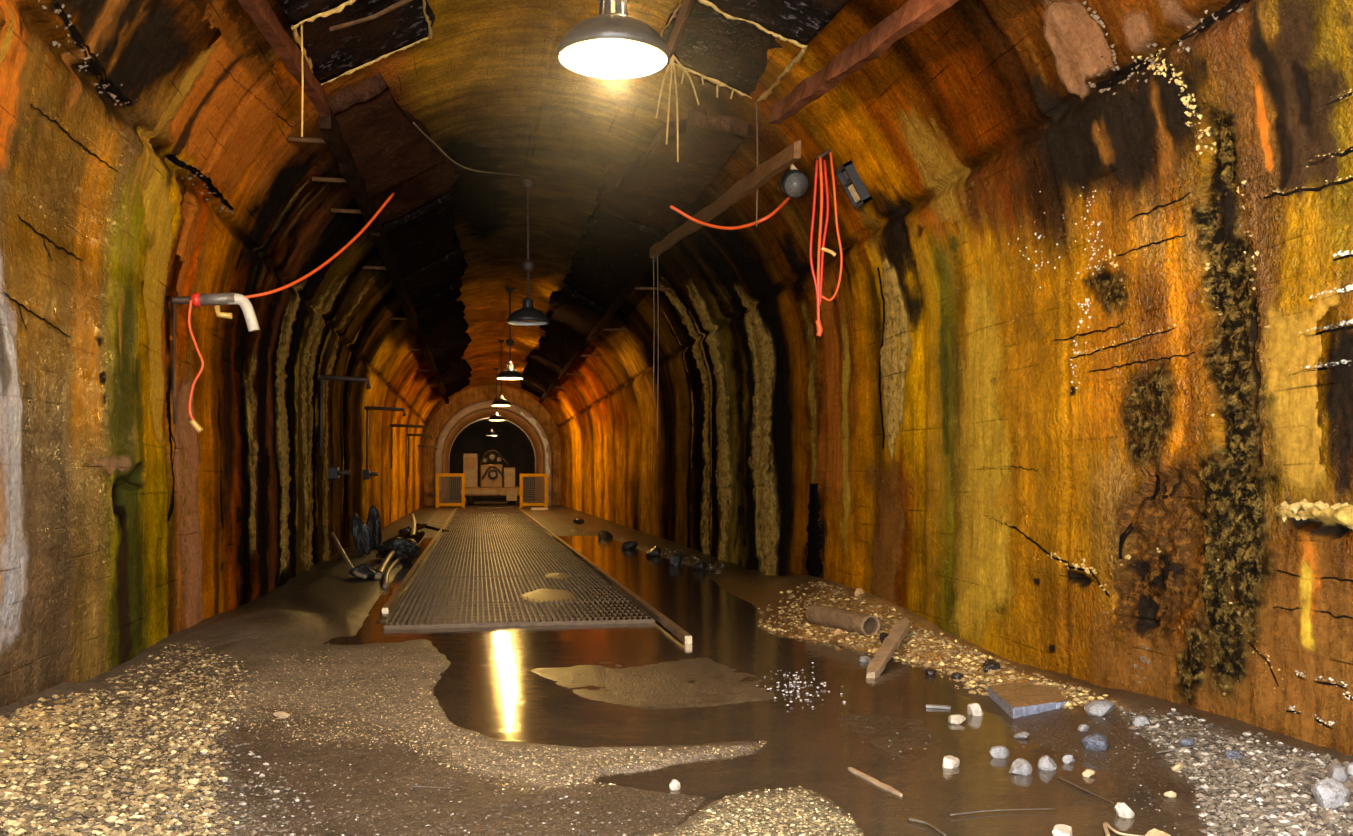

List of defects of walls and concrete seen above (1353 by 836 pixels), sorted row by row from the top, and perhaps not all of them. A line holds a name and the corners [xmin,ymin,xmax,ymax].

crack [1263,147,1353,199]
damp [0,252,28,652]
crack [0,291,70,337]
crack [1053,322,1195,372]
damp [1266,290,1353,493]
crack [1289,250,1353,376]
damp [117,517,143,664]
crack [983,514,1110,597]